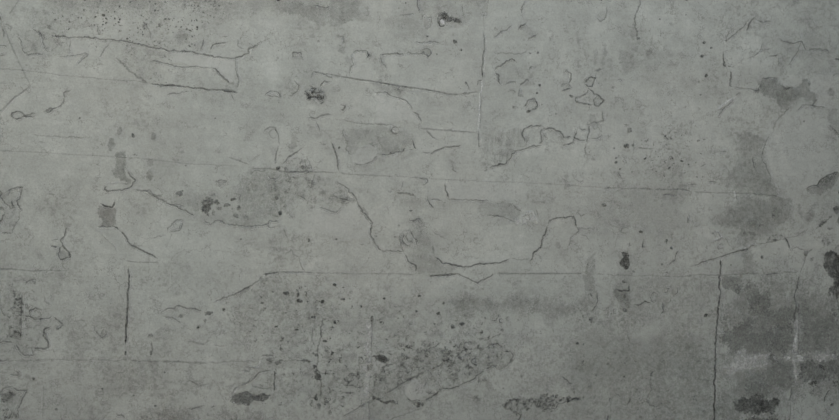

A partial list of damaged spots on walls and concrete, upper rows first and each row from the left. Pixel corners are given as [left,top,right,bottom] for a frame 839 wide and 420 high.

crack [699,244,754,420]